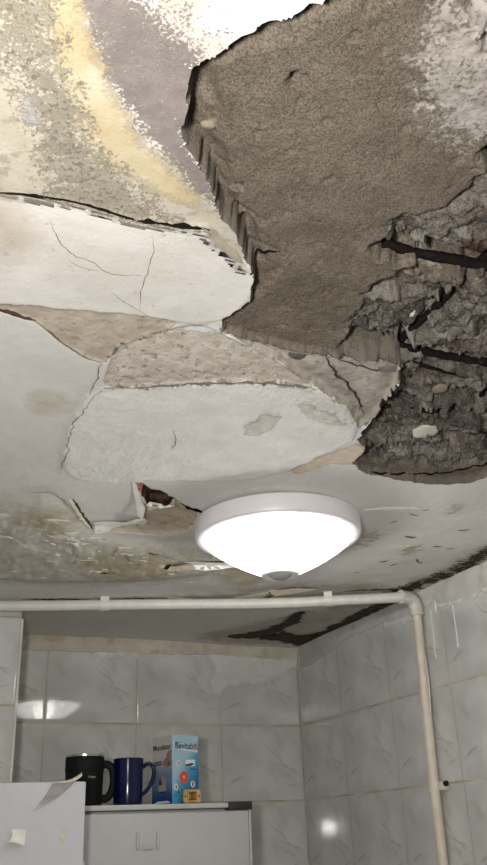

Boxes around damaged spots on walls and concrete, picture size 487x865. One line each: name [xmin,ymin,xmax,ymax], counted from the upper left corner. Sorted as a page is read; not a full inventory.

leakage [0,0,242,257]
spalling [0,0,487,485]
peeling [0,482,263,584]
peeling [234,587,317,599]
leakage [228,603,395,646]
leakage [392,549,487,592]